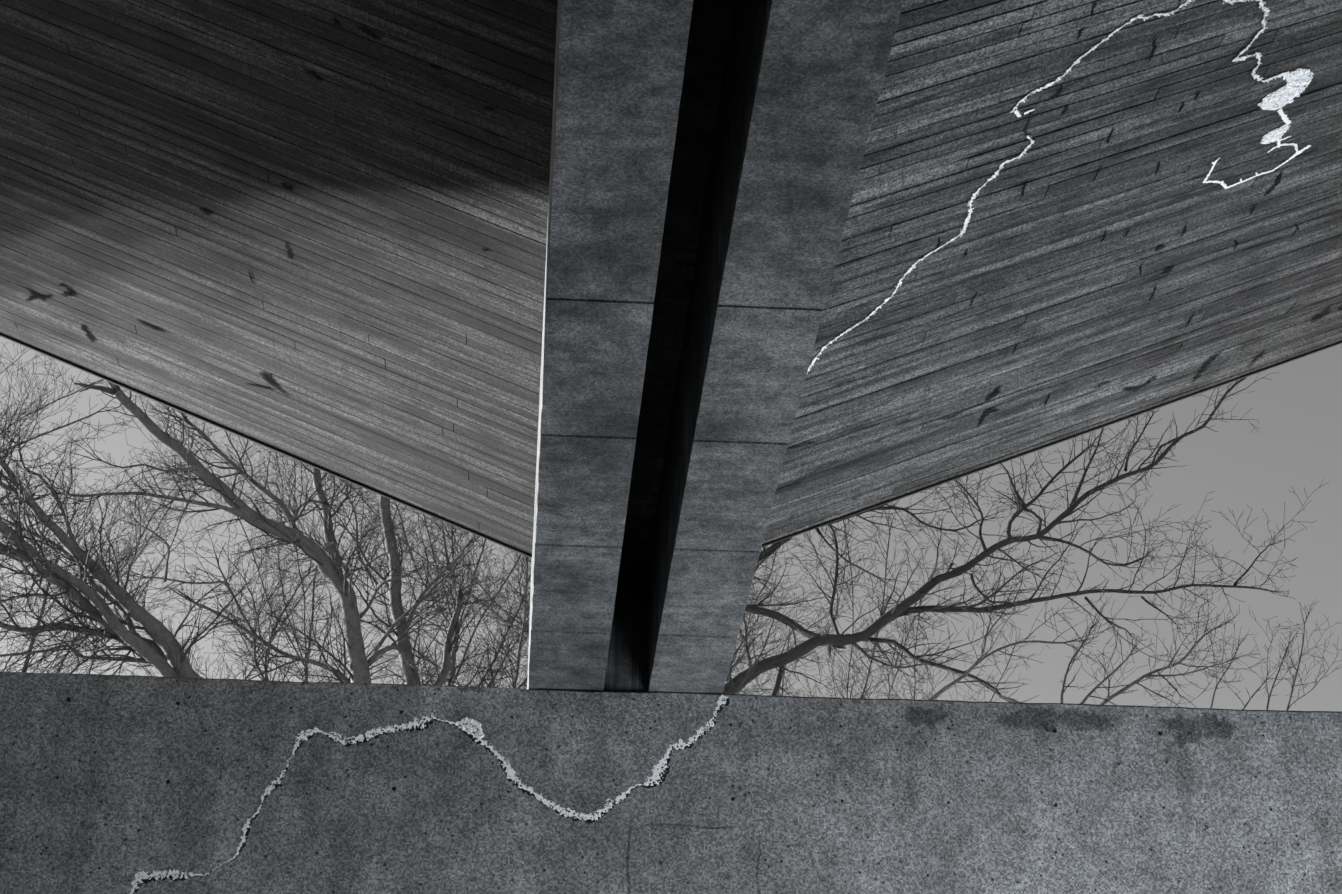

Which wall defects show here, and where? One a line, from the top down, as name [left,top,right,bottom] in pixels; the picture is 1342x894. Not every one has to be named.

crack [807,0,1314,374]
crack [130,694,730,894]